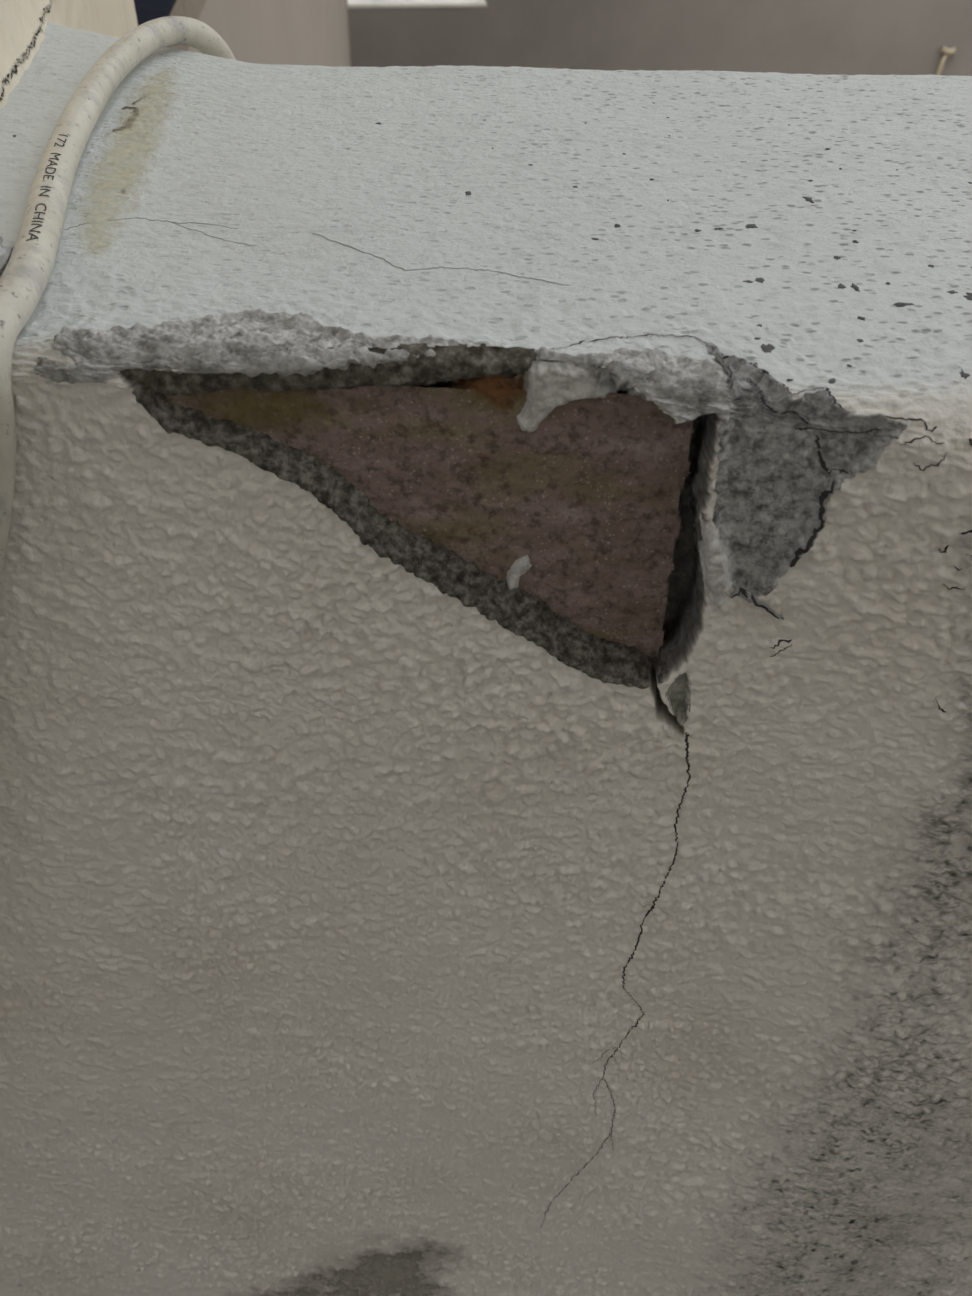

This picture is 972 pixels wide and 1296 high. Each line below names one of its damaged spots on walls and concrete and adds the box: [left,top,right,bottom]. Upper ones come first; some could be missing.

crack [0,0,52,102]
flaking render [0,236,14,277]
flaking render [34,309,907,726]
leakage [914,846,972,900]
crack [540,730,691,1228]
leakage [265,1246,445,1296]
leakage [777,1189,893,1296]